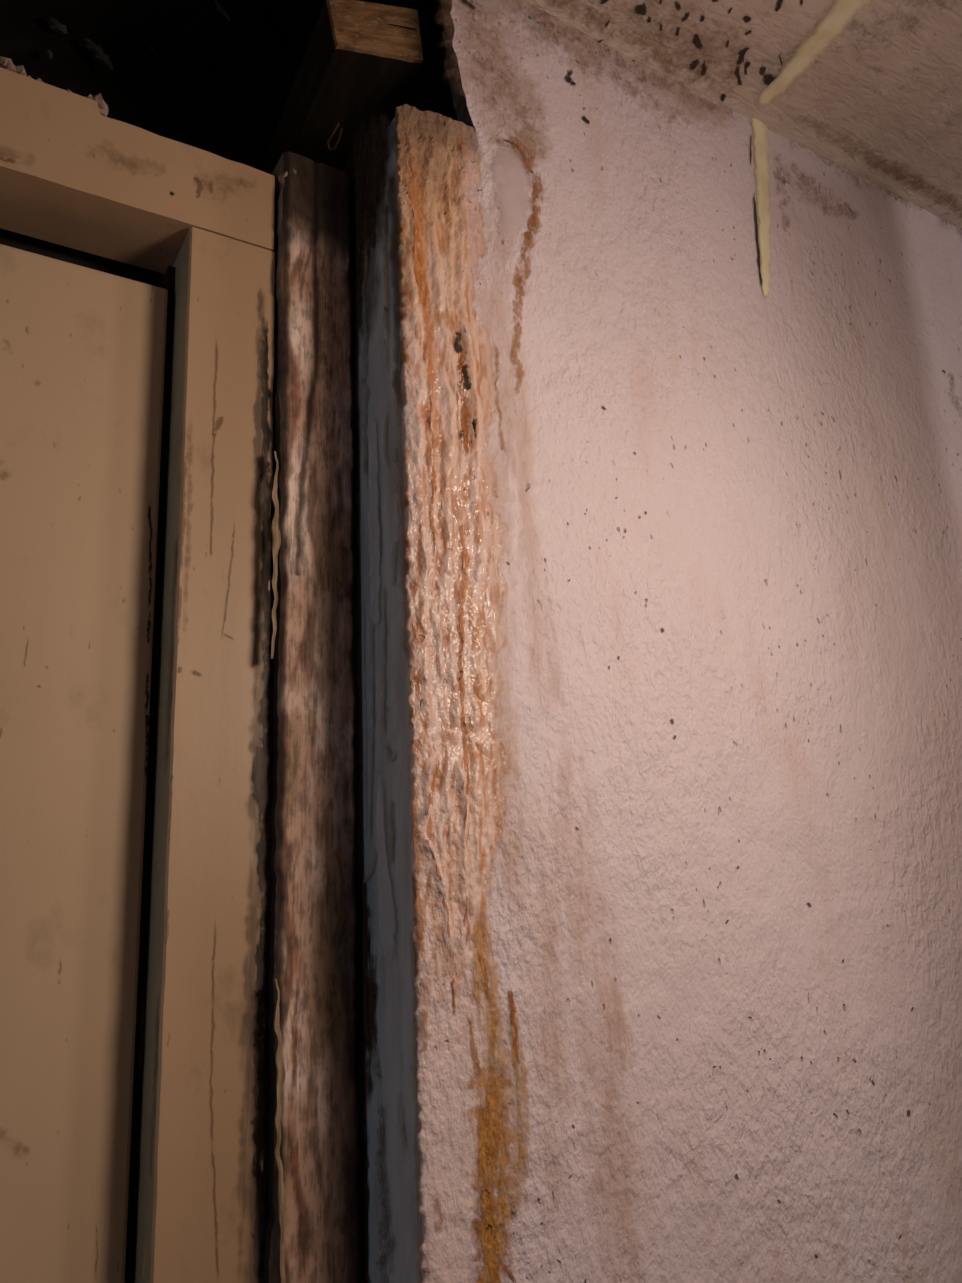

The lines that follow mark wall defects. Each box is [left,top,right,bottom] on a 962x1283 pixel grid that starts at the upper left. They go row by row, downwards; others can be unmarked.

water stain [350,114,407,658]
water stain [495,137,543,392]
water stain [242,293,275,1283]
peeling [361,417,397,947]
corrosion [469,922,528,1283]